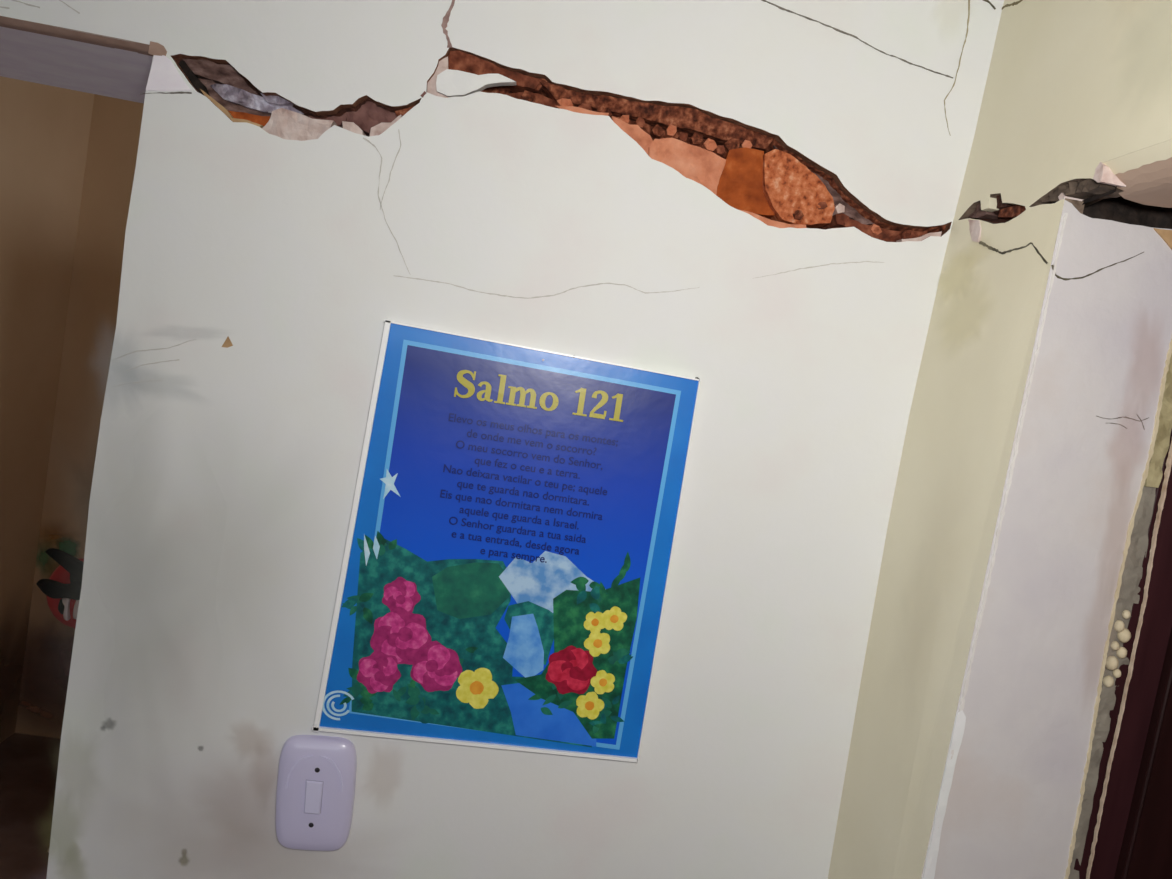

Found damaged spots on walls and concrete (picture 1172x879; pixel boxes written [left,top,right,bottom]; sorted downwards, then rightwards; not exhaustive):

crack [143,0,1172,299]